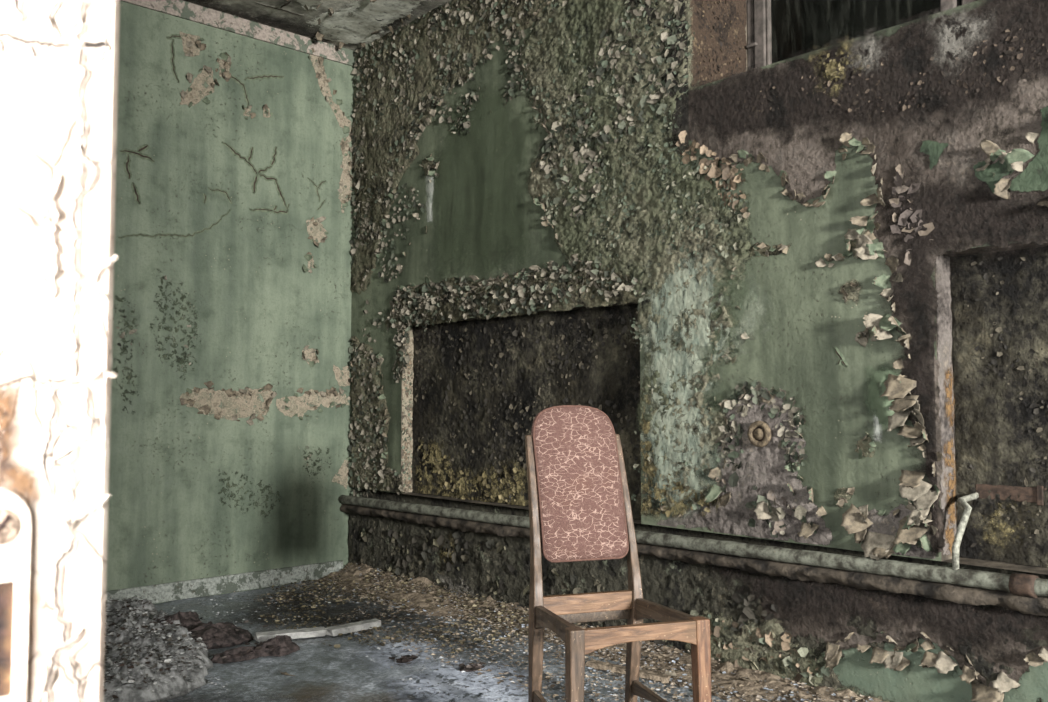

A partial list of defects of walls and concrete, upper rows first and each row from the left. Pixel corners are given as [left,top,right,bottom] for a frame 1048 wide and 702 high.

leakage [185,0,331,42]
crack [255,1,304,16]
mould [624,0,1048,152]
crack [307,178,327,210]
peeling [150,0,1048,561]
rust [0,390,38,502]
peeling [113,295,139,412]
crack [0,0,290,702]
leakage [357,179,1048,579]
rust [945,368,955,426]
rust [944,439,957,553]
peeling [348,513,1048,702]